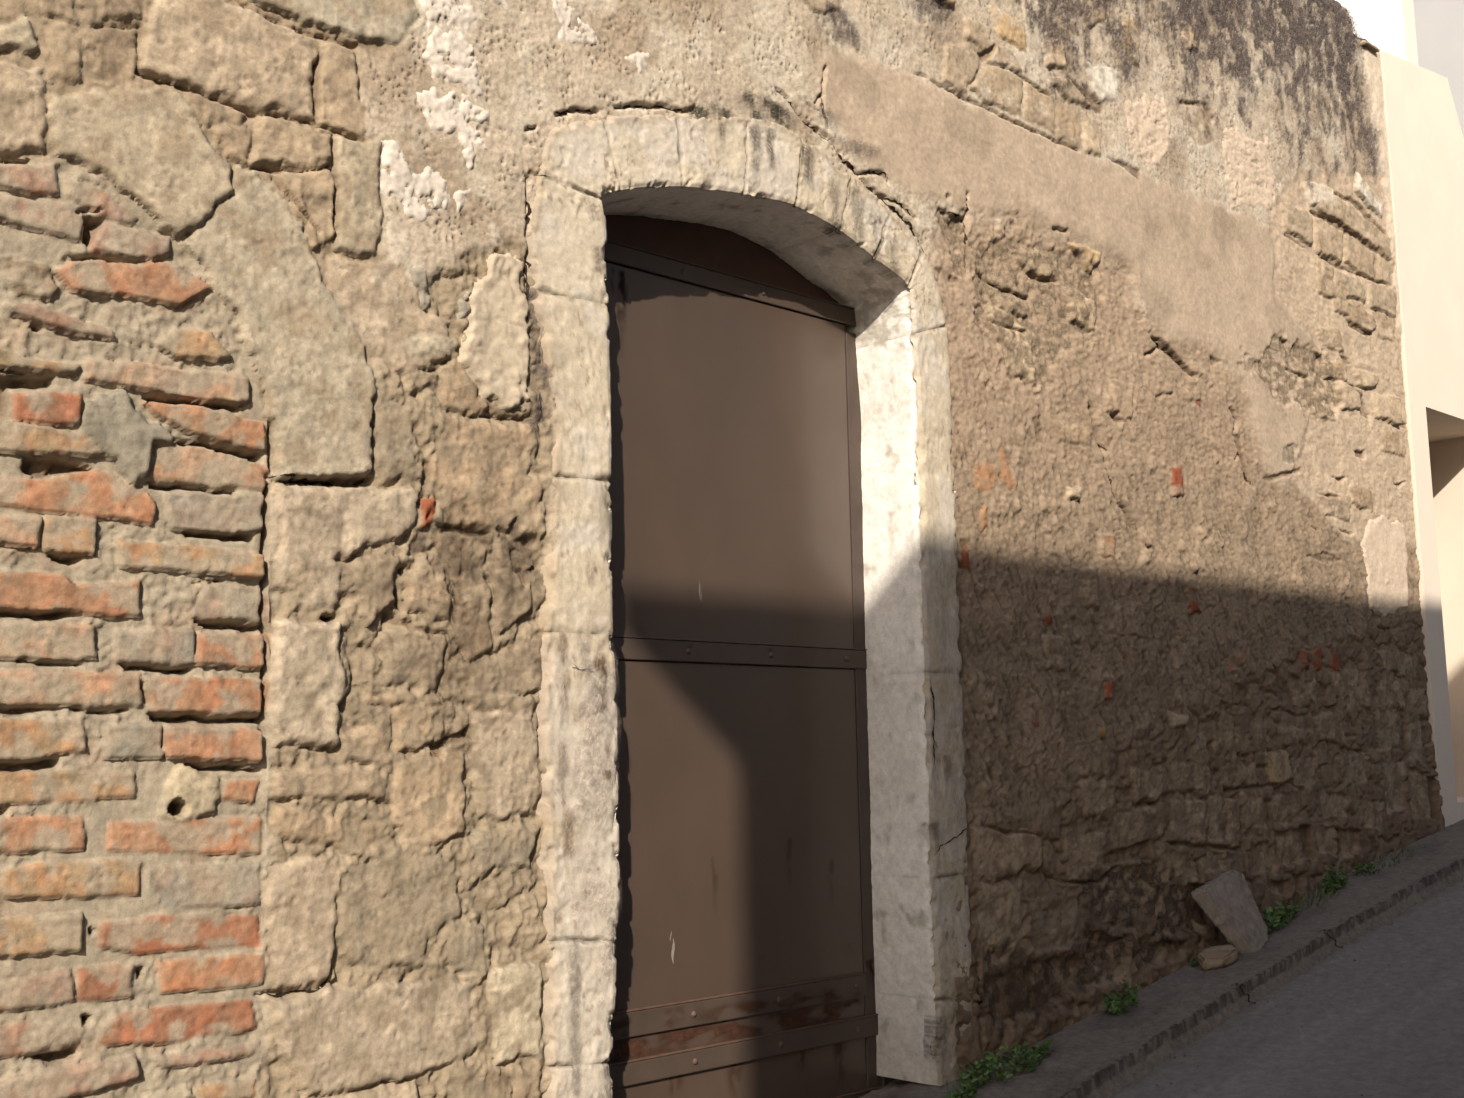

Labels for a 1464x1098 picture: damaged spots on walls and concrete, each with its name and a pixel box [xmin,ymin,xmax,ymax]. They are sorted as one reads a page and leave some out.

water stain [1017,0,1378,178]
crack [777,67,1021,299]
spalling [1250,341,1340,414]
rust [610,992,859,1059]